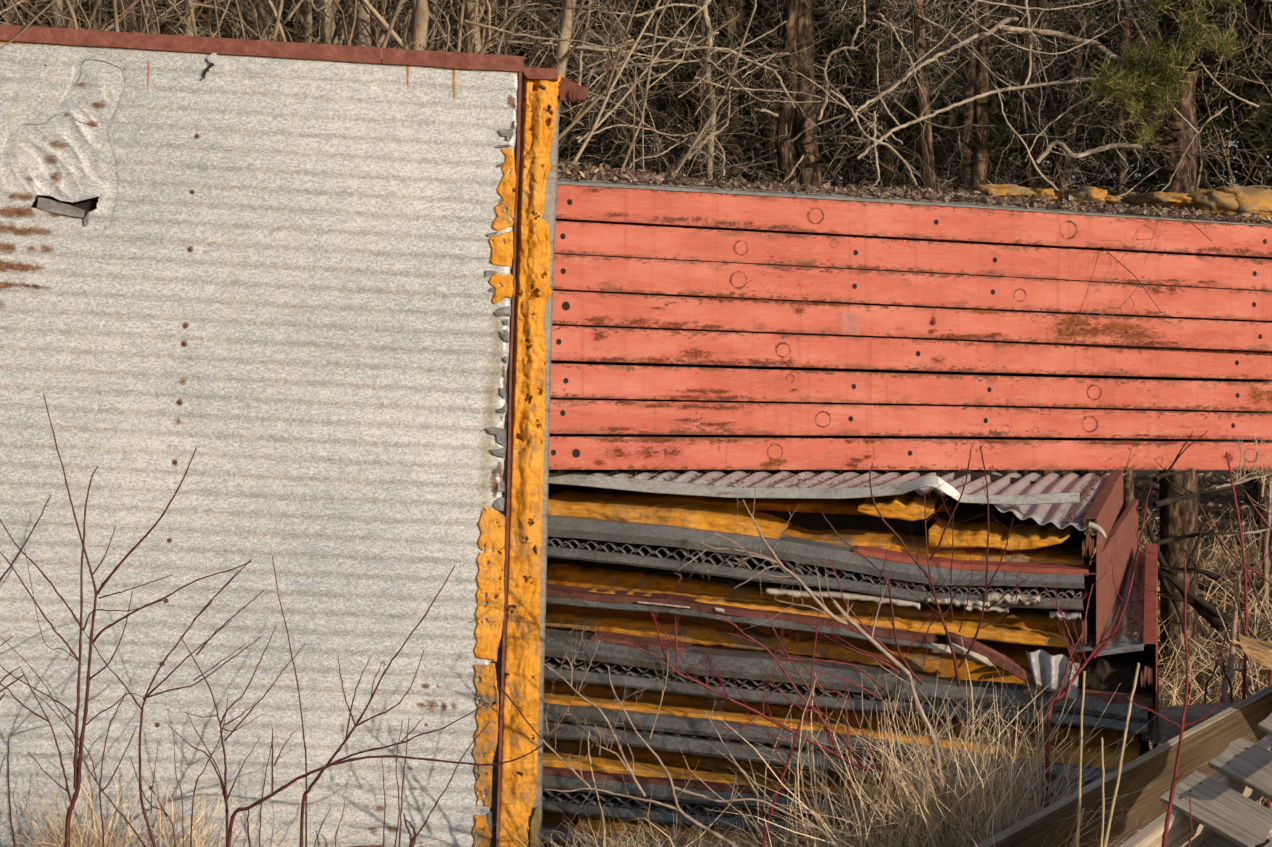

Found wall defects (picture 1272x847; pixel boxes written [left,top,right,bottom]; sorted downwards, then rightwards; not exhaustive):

corrosion [47,141,66,181]
corrosion [0,194,60,304]